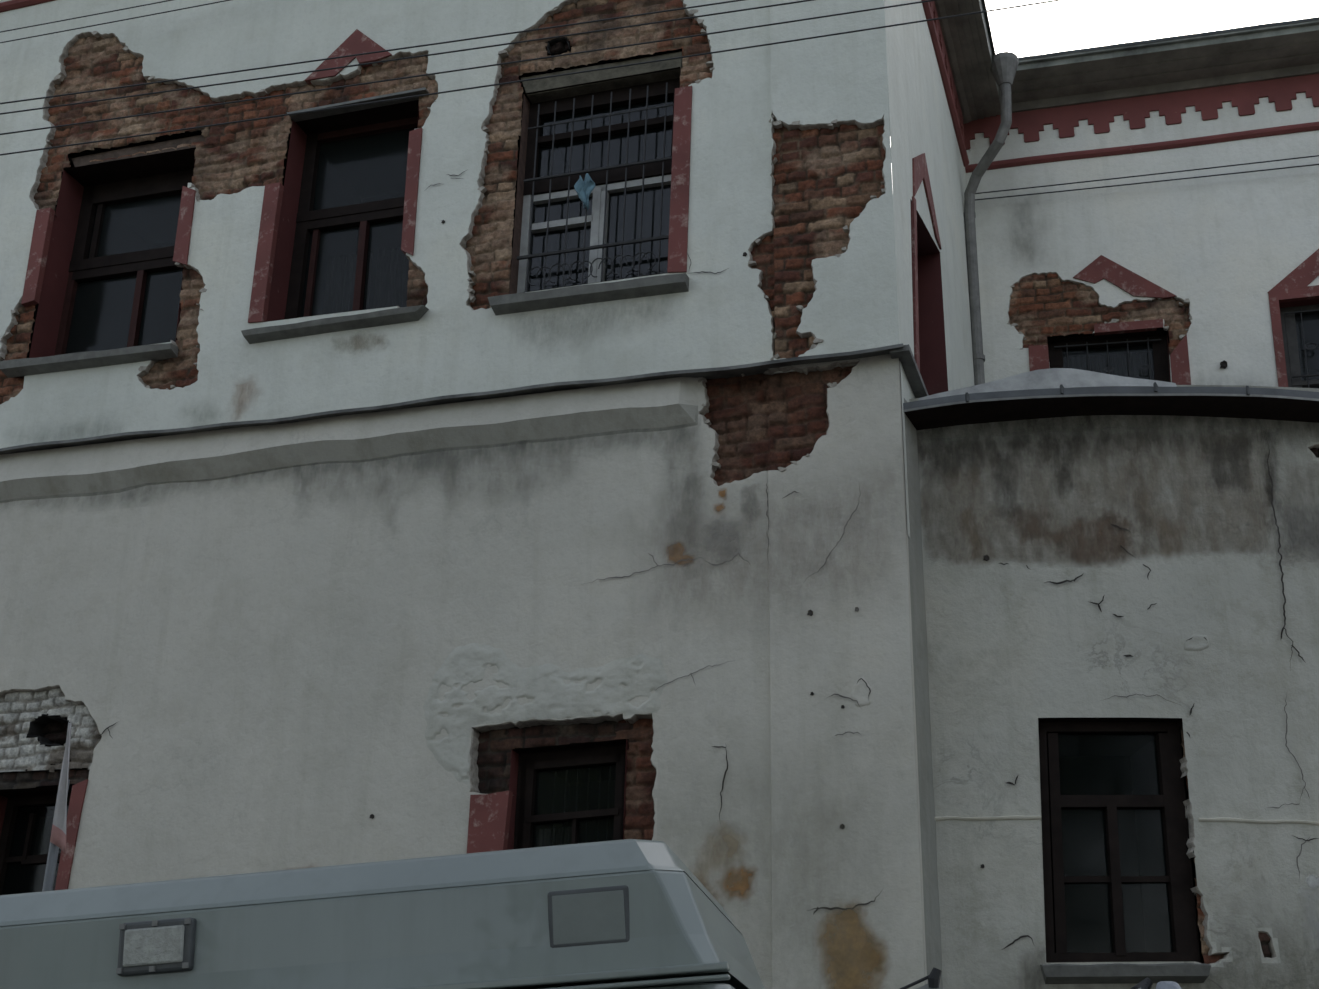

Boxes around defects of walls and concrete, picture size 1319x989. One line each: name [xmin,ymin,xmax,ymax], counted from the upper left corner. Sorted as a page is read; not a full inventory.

spalling [29,31,438,214]
spalling [459,0,715,310]
spalling [0,289,36,404]
spalling [136,262,207,390]
spalling [397,255,428,308]
spalling [698,112,890,512]
spalling [1007,272,1192,355]
crack [1265,431,1319,878]
spalling [0,685,102,790]
spalling [469,713,657,840]